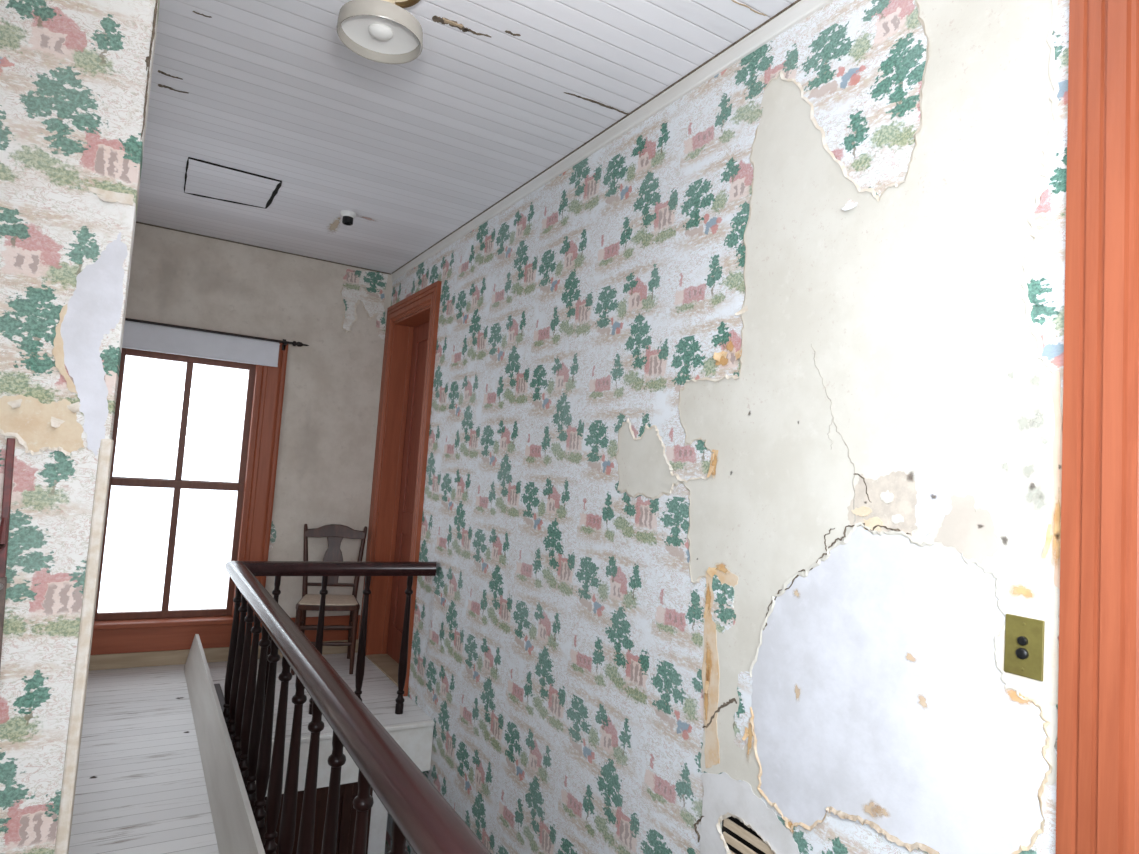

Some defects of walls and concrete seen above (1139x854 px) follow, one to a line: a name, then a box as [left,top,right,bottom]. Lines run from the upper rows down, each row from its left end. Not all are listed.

flaking render [51,232,128,456]
crack [763,344,910,630]
flaking render [700,454,1053,854]